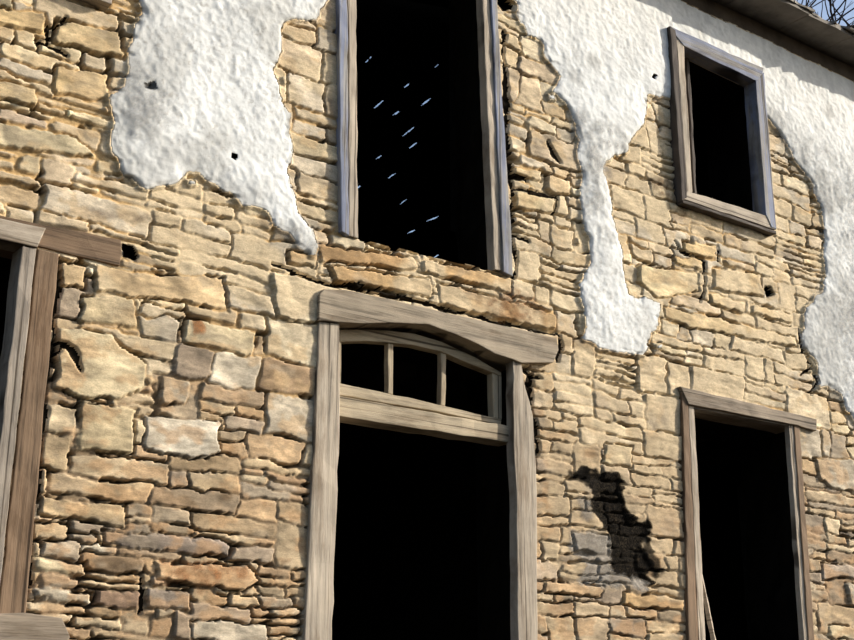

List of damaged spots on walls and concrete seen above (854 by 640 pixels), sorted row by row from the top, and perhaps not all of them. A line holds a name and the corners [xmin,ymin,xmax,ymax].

peeling [498,0,854,419]
crack [674,240,720,302]
crack [47,257,82,378]
crack [798,332,819,396]
crack [40,401,48,441]
crack [35,470,43,502]
crack [27,543,35,589]
water stain [567,530,648,592]